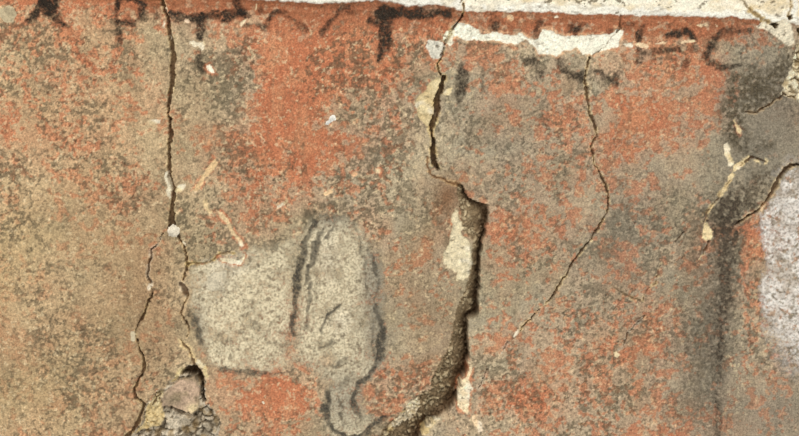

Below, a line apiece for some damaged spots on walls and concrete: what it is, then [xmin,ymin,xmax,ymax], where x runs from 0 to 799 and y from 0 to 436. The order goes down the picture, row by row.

flaking render [405,0,799,104]
crack [739,0,794,24]
crack [125,0,236,436]
crack [380,0,490,436]
crack [501,13,624,354]
crack [674,93,799,263]
crack [607,261,662,359]
spalling [132,359,223,436]